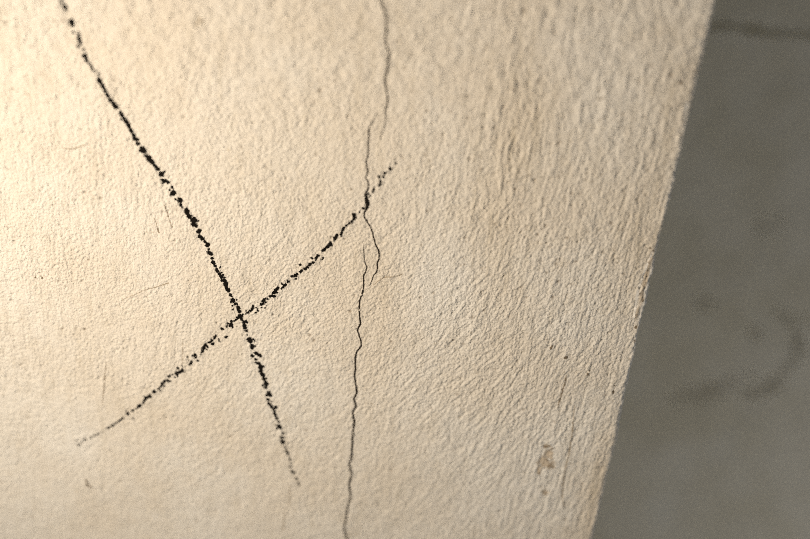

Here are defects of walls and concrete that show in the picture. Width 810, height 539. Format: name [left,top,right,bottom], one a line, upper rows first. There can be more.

crack [343,0,390,539]